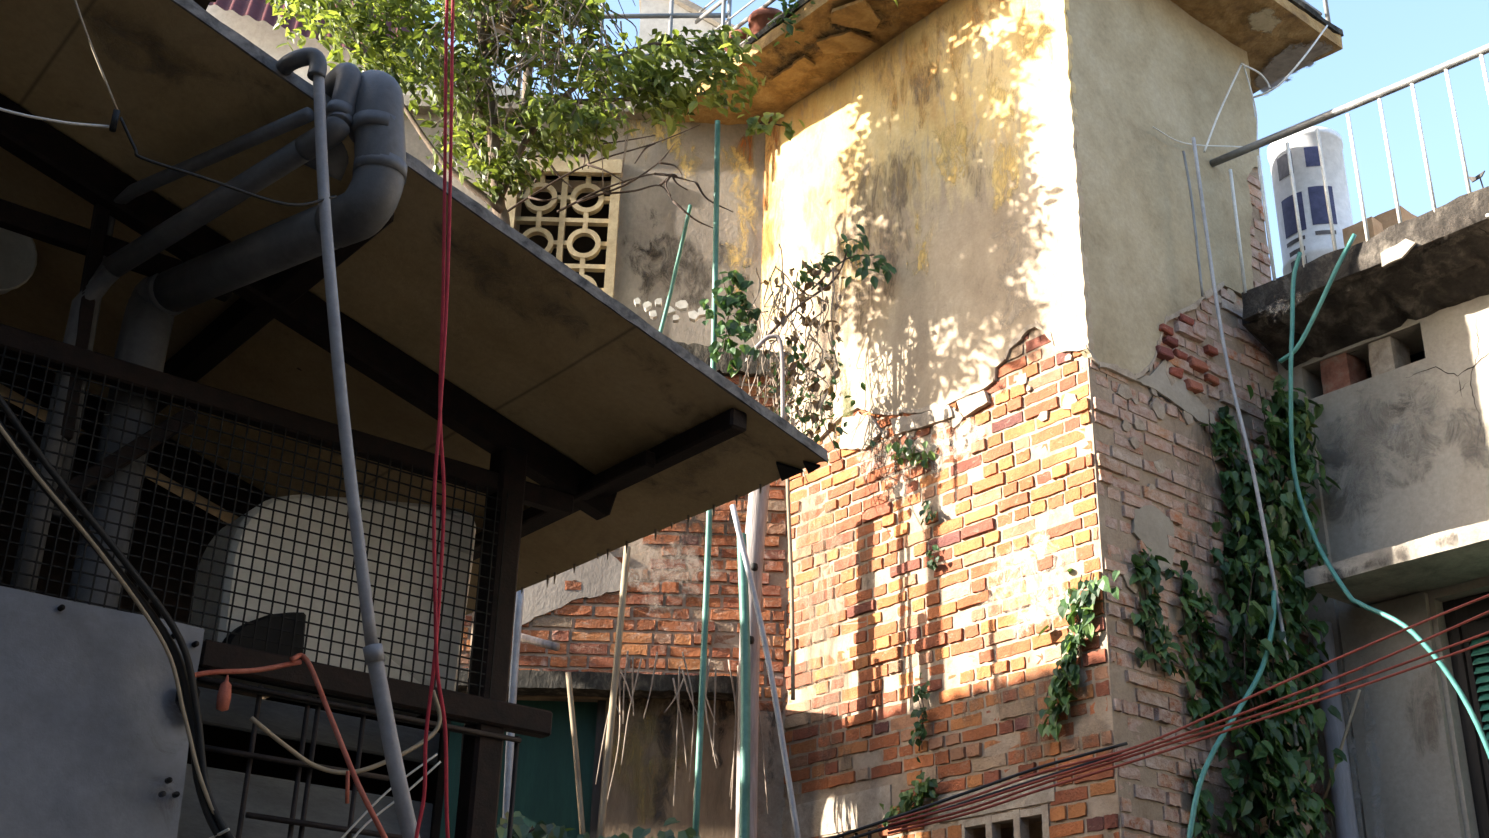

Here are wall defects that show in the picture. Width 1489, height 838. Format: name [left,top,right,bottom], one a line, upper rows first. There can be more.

flaking render [773,0,880,87]
spalling [1248,9,1282,33]
spalling [1255,40,1333,95]
leakage [624,235,732,306]
peeling [838,240,866,310]
leakage [803,153,915,412]
flaking render [839,390,991,498]
flaking render [1017,373,1032,392]
flaking render [1037,393,1078,422]
spalling [1115,313,1220,449]
leakage [1452,414,1489,458]